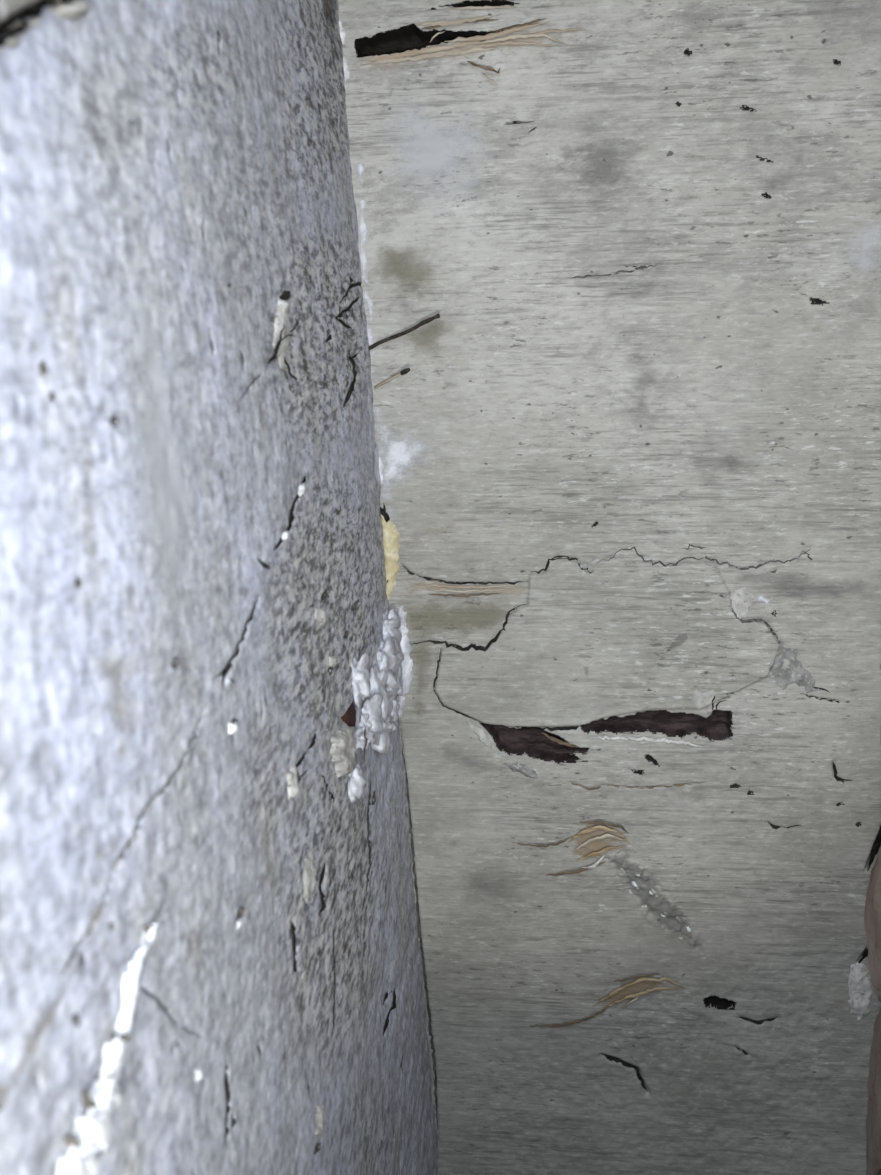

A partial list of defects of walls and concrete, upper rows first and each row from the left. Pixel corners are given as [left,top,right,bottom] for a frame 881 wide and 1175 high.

crack [404,544,813,722]
damp [348,605,498,803]
crack [517,724,579,732]
spalling [466,690,733,779]
crack [806,687,840,703]
peeling [517,821,630,876]
peeling [530,973,685,1027]
crack [56,924,203,1175]